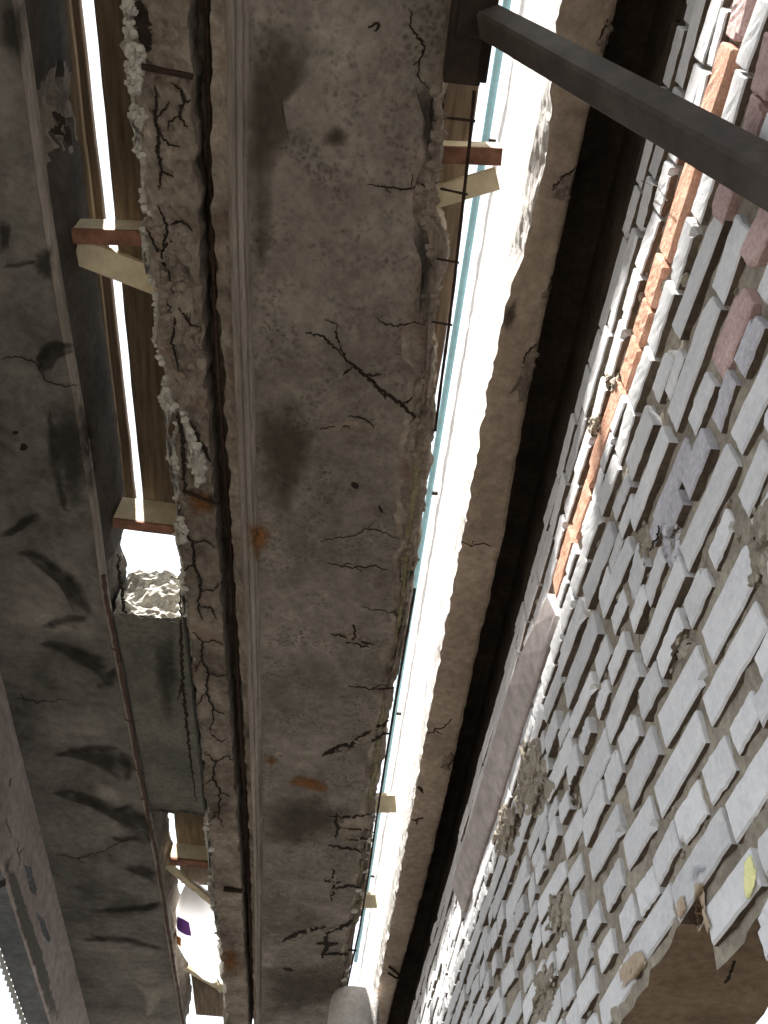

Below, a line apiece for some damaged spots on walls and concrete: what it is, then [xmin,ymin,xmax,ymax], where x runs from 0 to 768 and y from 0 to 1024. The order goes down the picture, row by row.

crack [408,9,429,89]
crack [153,82,191,190]
crack [160,234,172,273]
crack [3,353,77,388]
crack [305,319,435,433]
crack [375,317,426,327]
spalling [119,0,254,1010]
crack [177,533,234,827]
spalling [101,553,185,1024]